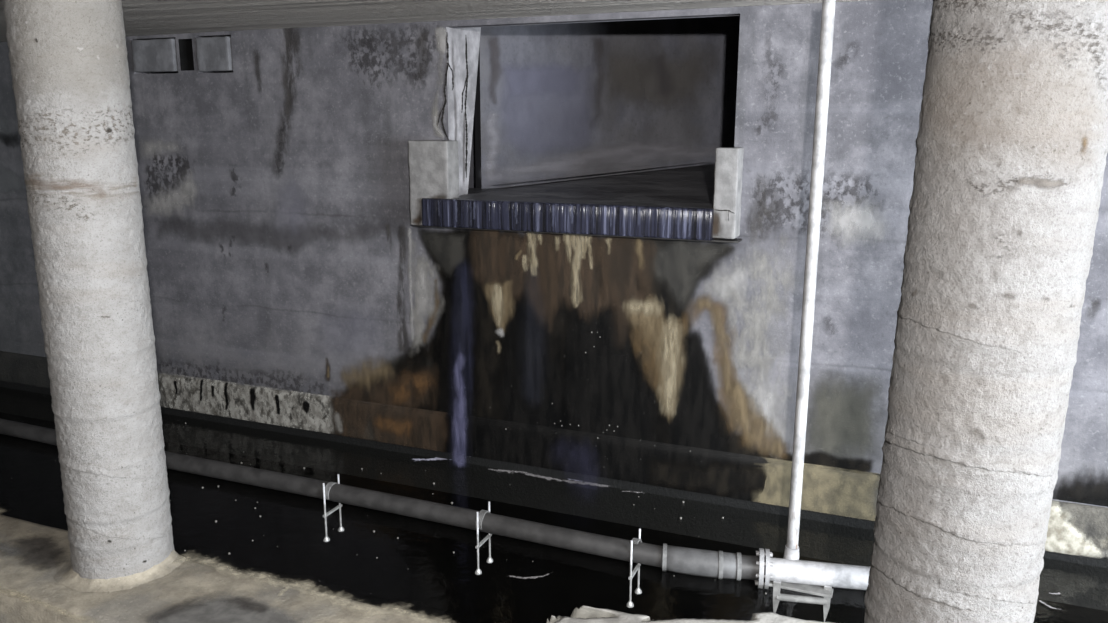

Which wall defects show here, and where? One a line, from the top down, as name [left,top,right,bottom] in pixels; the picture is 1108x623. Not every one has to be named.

leakage [277,28,299,172]
leakage [348,31,436,82]
crack [437,33,468,178]
leakage [145,144,196,212]
leakage [499,204,542,276]
corrosion [474,230,654,329]
corrosion [326,360,448,452]
leakage [360,225,877,521]
leakage [1055,476,1108,507]